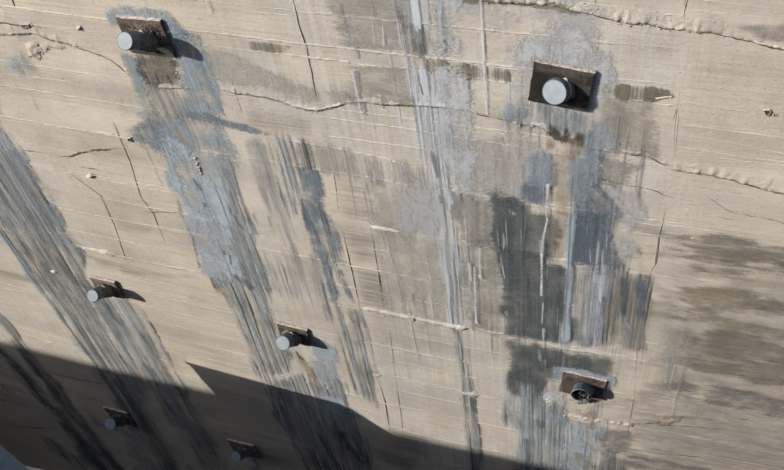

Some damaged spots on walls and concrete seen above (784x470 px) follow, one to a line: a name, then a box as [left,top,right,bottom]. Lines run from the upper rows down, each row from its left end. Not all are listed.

crack [0,15,133,80]
crack [455,0,784,51]
crack [62,144,124,169]
crack [154,81,784,198]
water stain [105,6,376,470]
water stain [326,0,651,470]
water stain [0,131,221,470]